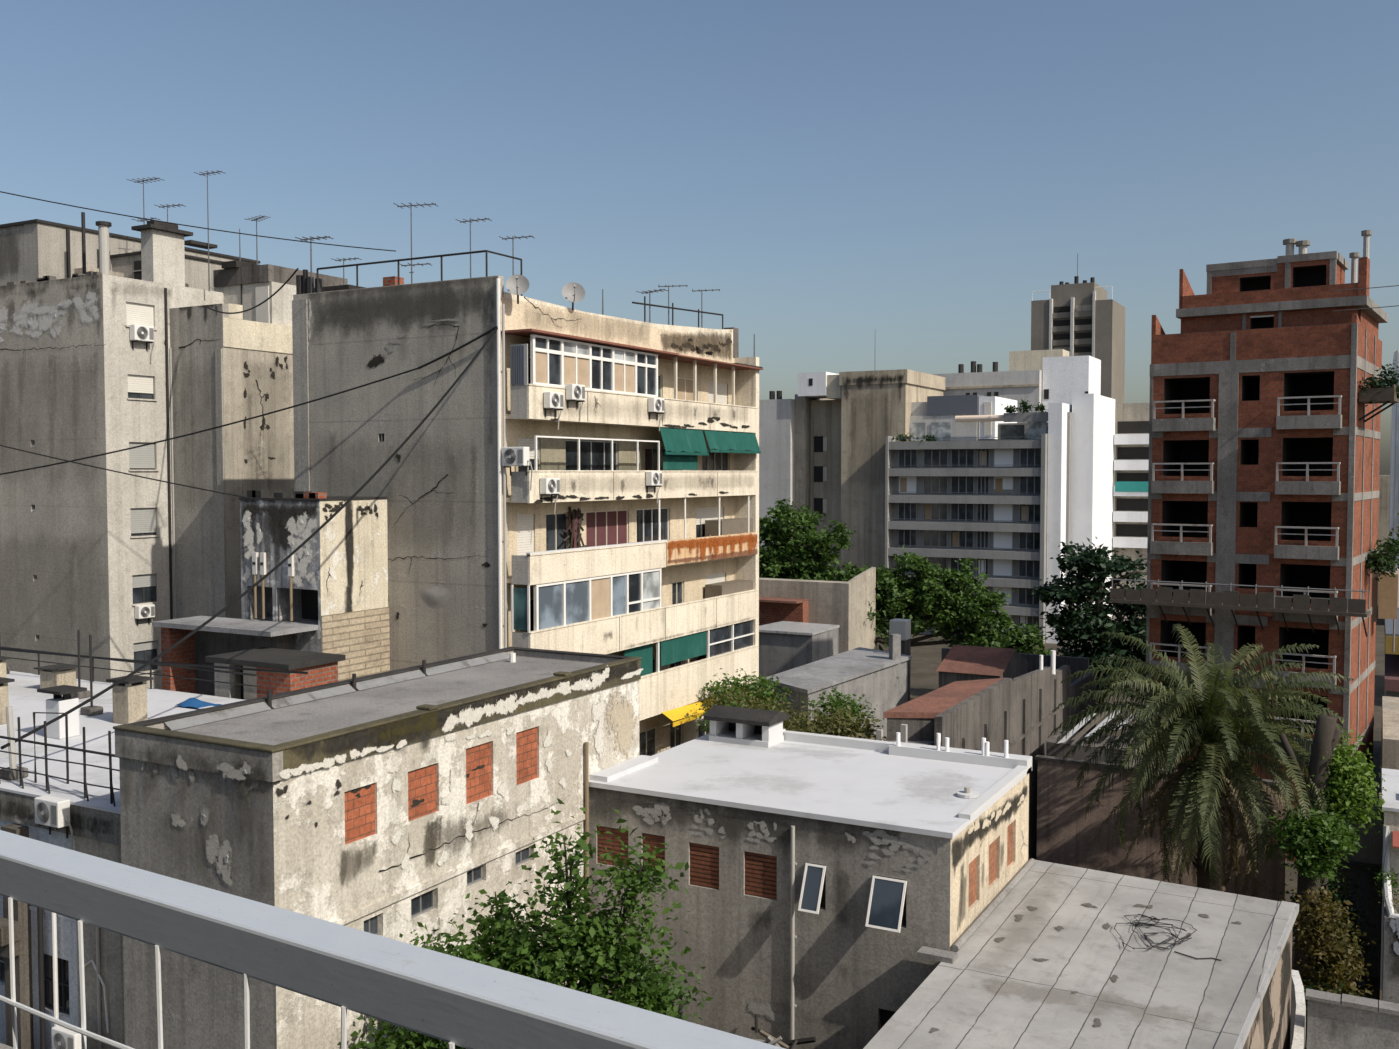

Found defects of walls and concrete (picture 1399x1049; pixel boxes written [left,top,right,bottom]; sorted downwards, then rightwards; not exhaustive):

damp [311,279,491,329]
damp [661,333,731,359]
peeling [242,510,263,586]
peeling [285,501,379,588]
crack [390,474,483,570]
peeling [442,665,643,759]
peeling [464,801,499,841]
peeling [632,802,672,825]
peeling [690,808,726,839]
peeling [746,820,777,843]
peeling [968,795,1024,847]
peeling [1389,917,1399,955]